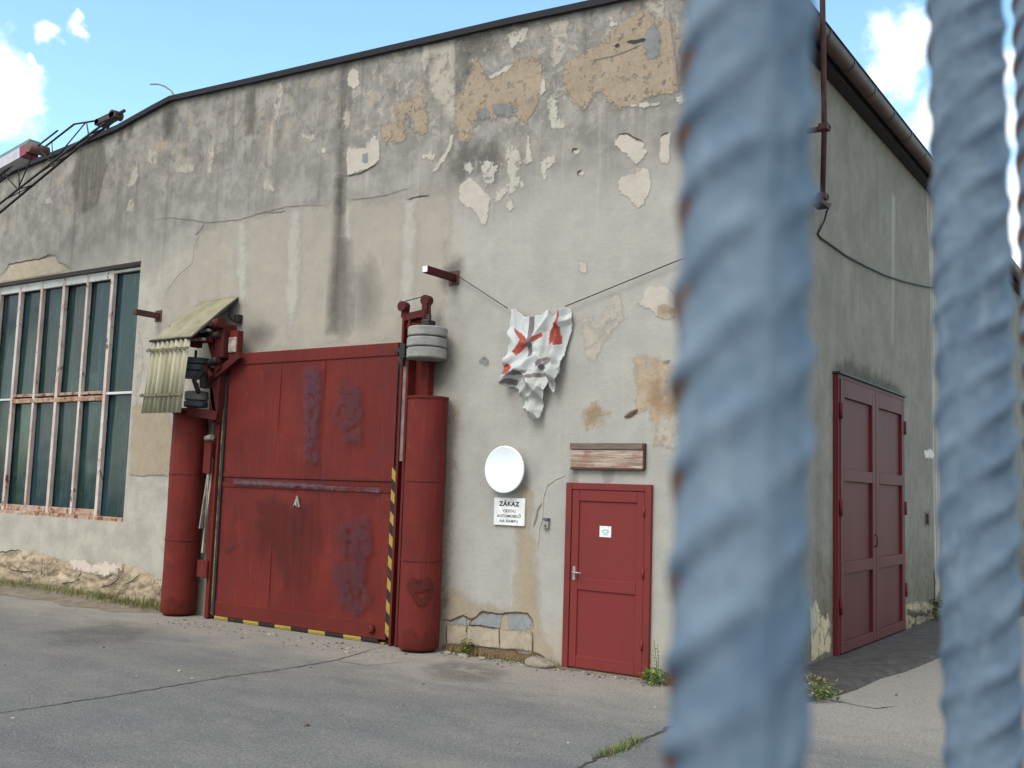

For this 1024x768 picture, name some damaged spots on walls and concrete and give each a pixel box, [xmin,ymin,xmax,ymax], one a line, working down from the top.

flaking render [345,0,682,225]
crack [155,204,317,234]
flaking render [0,254,70,282]
flaking render [637,284,674,319]
flaking render [625,356,677,448]
flaking render [0,549,162,605]
flaking render [444,487,551,659]
flaking render [810,600,831,661]